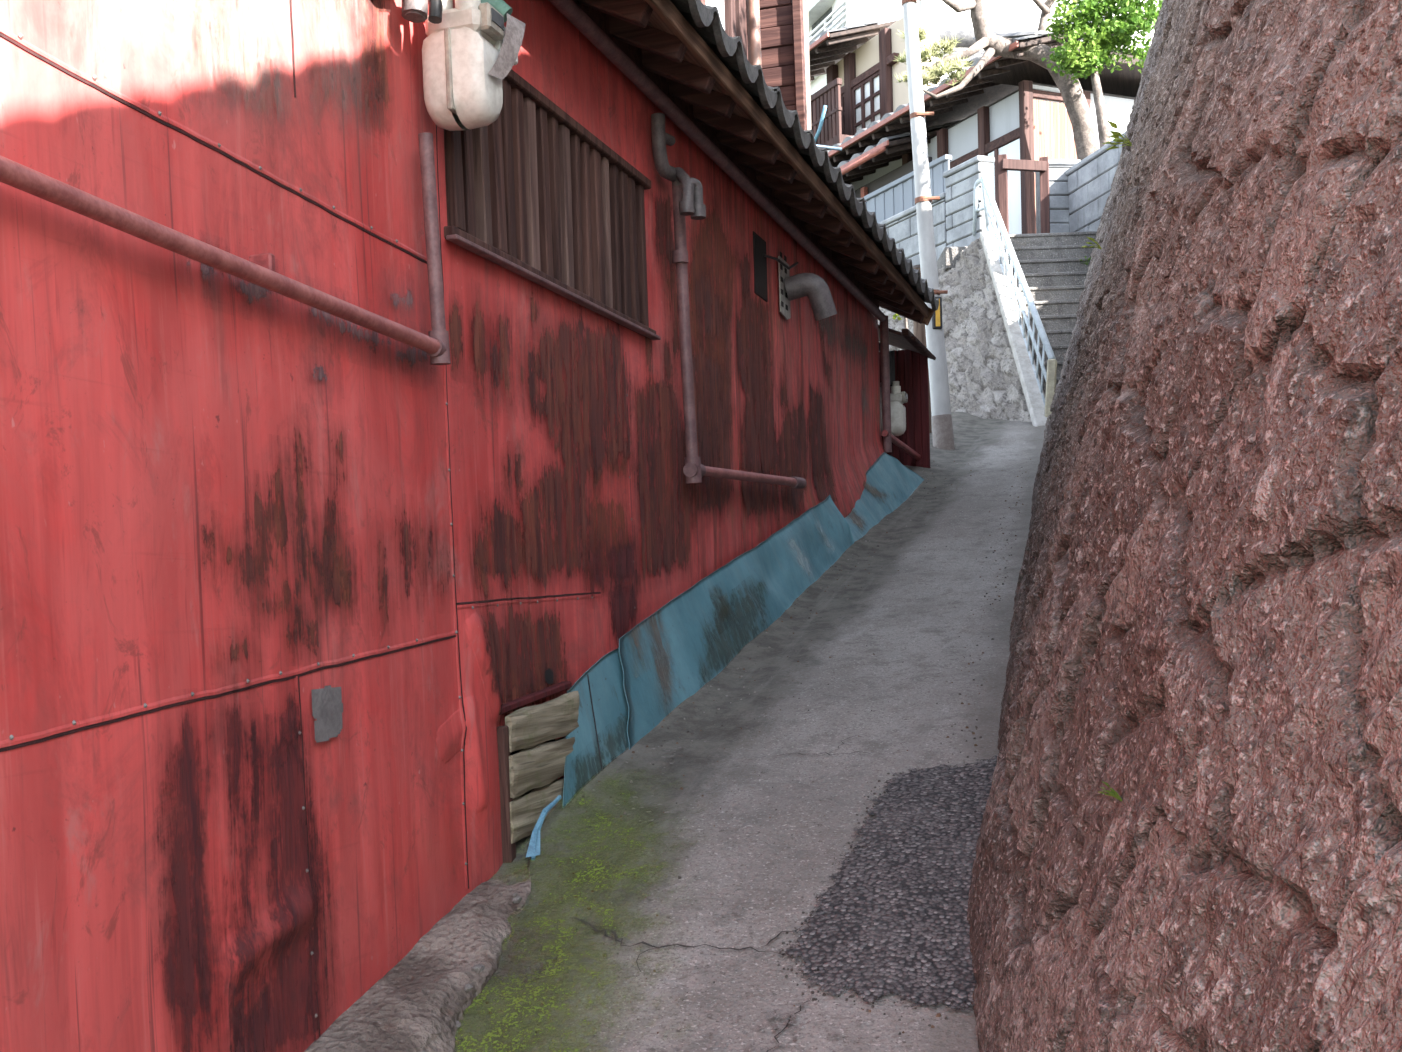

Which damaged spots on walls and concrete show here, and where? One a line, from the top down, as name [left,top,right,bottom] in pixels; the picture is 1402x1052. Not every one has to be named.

damp [206,18,281,117]
corrosion [157,693,331,1052]